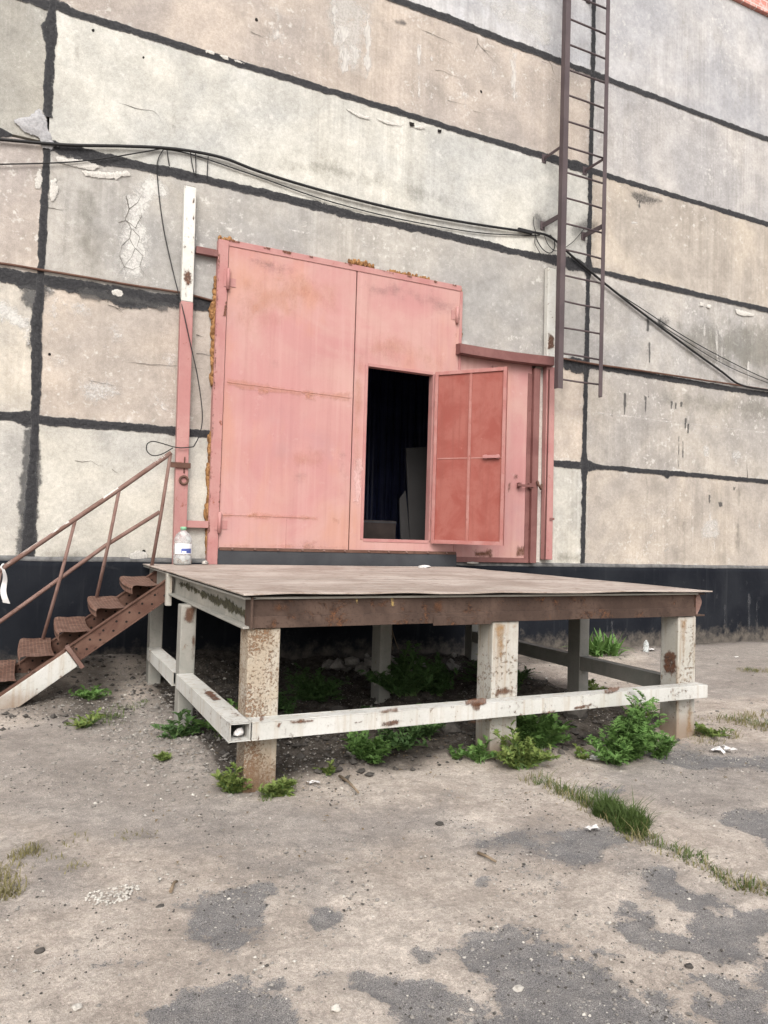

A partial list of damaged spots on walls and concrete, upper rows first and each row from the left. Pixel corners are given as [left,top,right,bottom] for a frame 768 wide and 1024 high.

spalling [56,156,131,180]
spalling [34,168,59,201]
crack [118,195,144,273]
corrosion [664,651,676,673]
corrosion [465,689,509,710]